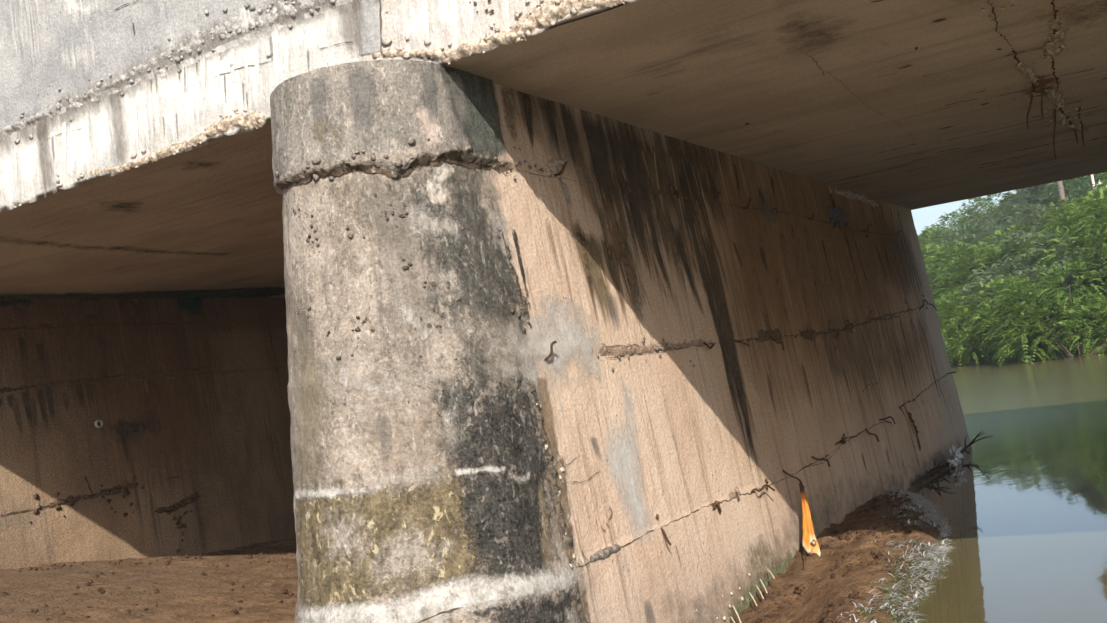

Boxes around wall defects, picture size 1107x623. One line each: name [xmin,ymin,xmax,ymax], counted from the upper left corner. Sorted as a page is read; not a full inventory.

spalling [76,107,265,180]
spalling [0,0,345,146]
damp [349,70,374,129]
crack [775,0,1107,183]
damp [401,0,754,456]
crack [719,295,928,350]
damp [455,411,543,549]
damp [611,373,645,530]
crack [576,422,884,568]